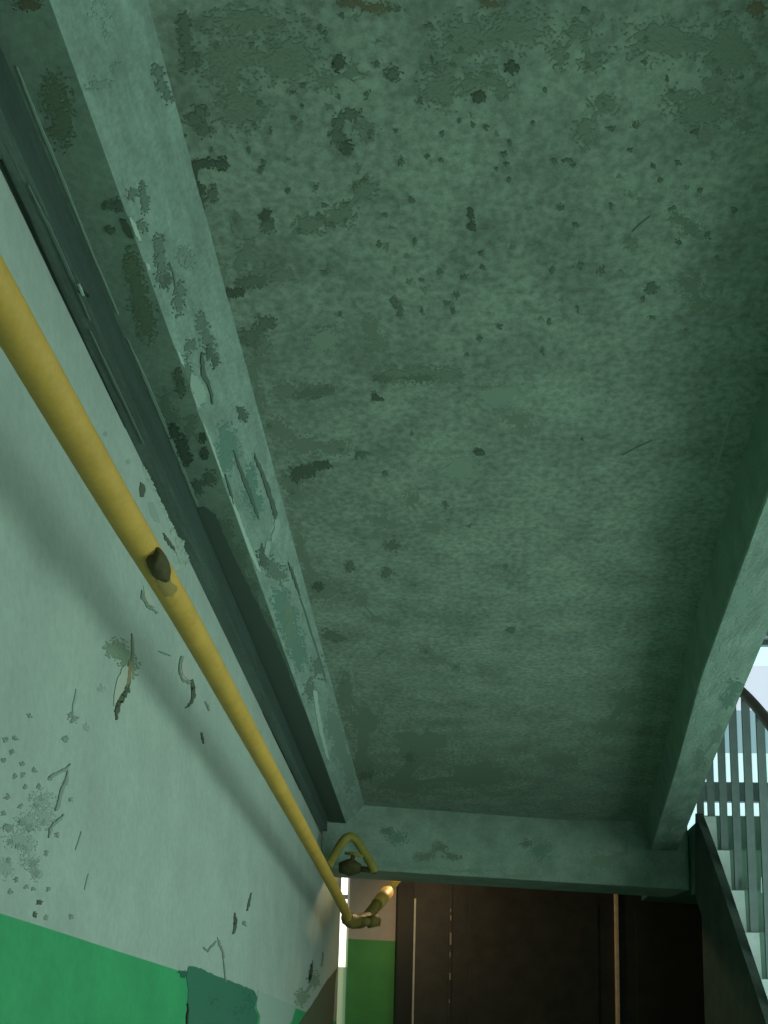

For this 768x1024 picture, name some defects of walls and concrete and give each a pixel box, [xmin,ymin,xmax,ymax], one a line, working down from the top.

spalling [120,216,142,241]
flaking render [176,350,207,408]
flaking render [125,459,189,568]
peeling [127,339,199,507]
peeling [202,422,224,477]
crack [224,450,278,520]
peeling [229,496,280,572]
peeling [113,666,132,706]
crack [114,633,210,744]
peeling [313,690,330,761]
crack [48,763,82,850]
crack [203,893,252,982]